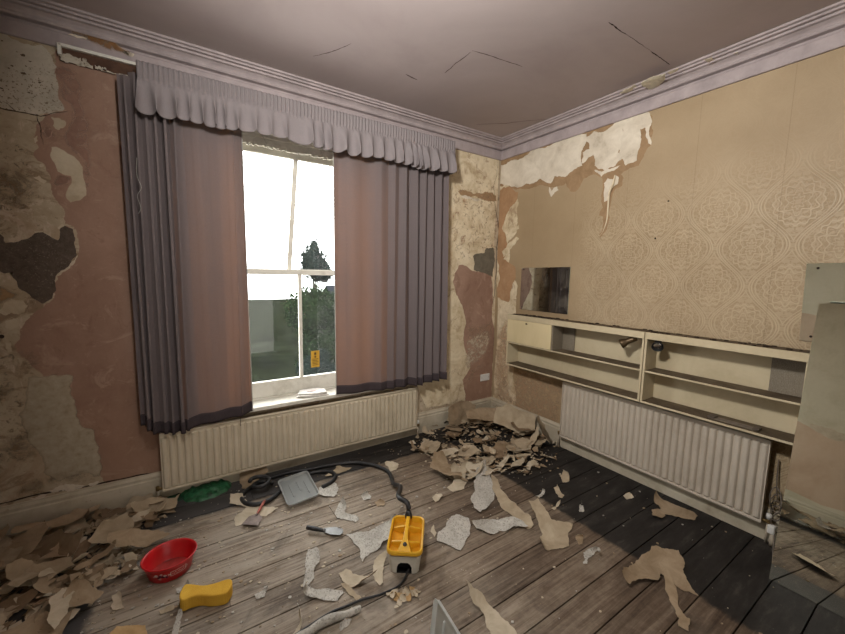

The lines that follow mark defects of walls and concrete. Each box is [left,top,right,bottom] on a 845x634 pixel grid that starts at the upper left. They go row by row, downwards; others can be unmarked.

crack [445,51,522,73]
crack [610,23,670,65]
crack [3,101,67,140]
flaking render [0,33,161,483]
flaking render [417,112,653,408]